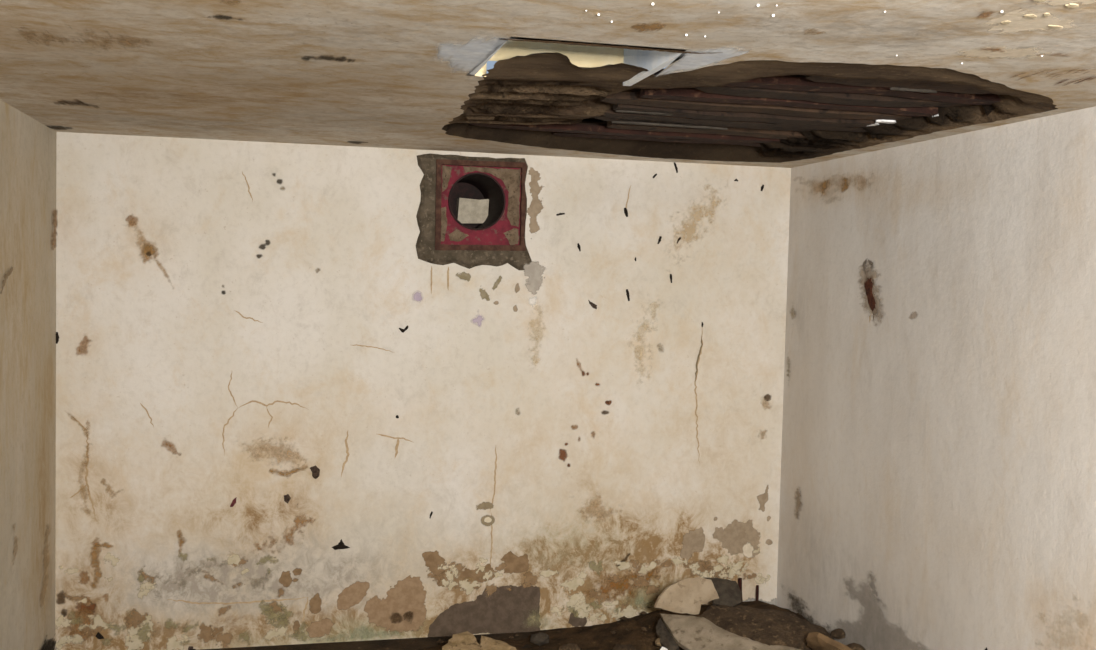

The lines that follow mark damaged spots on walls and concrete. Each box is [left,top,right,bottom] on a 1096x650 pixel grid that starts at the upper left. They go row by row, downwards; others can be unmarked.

water stain [438,39,505,71]
water stain [661,48,747,74]
peeling [980,0,1096,34]
flaking render [442,52,1058,163]
crack [222,373,309,454]
crack [694,330,703,461]
water stain [91,542,112,588]
peeling [55,572,249,650]
peeling [228,554,334,641]
water stain [256,516,312,552]
water stain [477,502,495,526]
peeling [337,517,773,637]